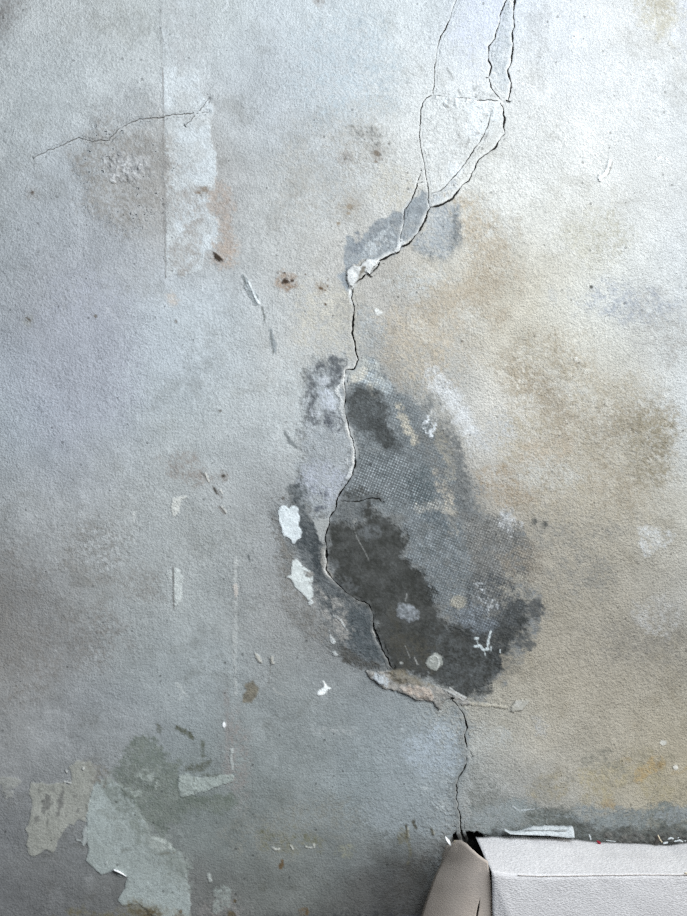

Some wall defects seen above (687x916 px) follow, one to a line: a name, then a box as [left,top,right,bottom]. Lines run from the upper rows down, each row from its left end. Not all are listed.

leakage [631,0,687,64]
crack [33,97,210,160]
crack [321,0,519,671]
leakage [370,176,687,558]
peeling [316,680,332,696]
leakage [384,604,441,675]
spalling [366,661,471,713]
leakage [630,590,685,642]
peeling [0,758,233,916]
peeling [177,686,234,798]
crack [450,699,472,842]
leakage [464,745,687,845]